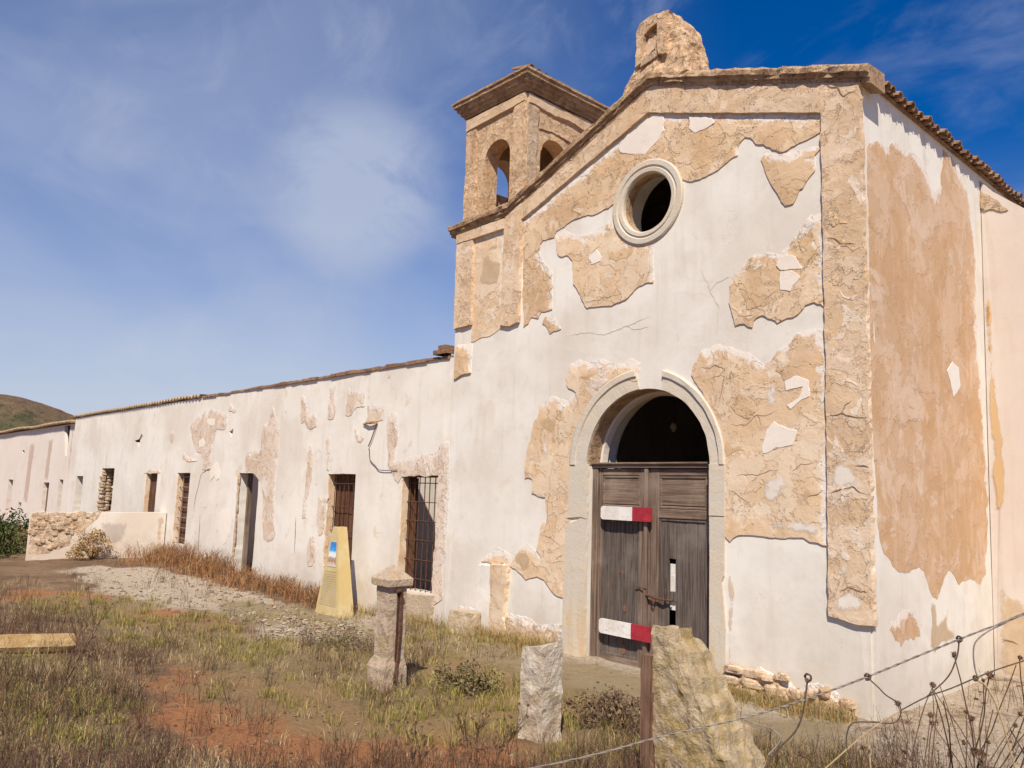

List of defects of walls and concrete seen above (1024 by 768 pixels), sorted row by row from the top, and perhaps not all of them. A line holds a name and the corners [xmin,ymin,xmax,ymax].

peeling [183,403,237,481]
peeling [245,407,280,542]
peeling [301,386,450,605]
peeling [453,231,504,380]
peeling [481,358,641,598]
crack [579,317,647,335]
peeling [522,114,821,334]
peeling [691,329,852,546]
peeling [729,141,1008,599]
peeling [890,609,922,646]